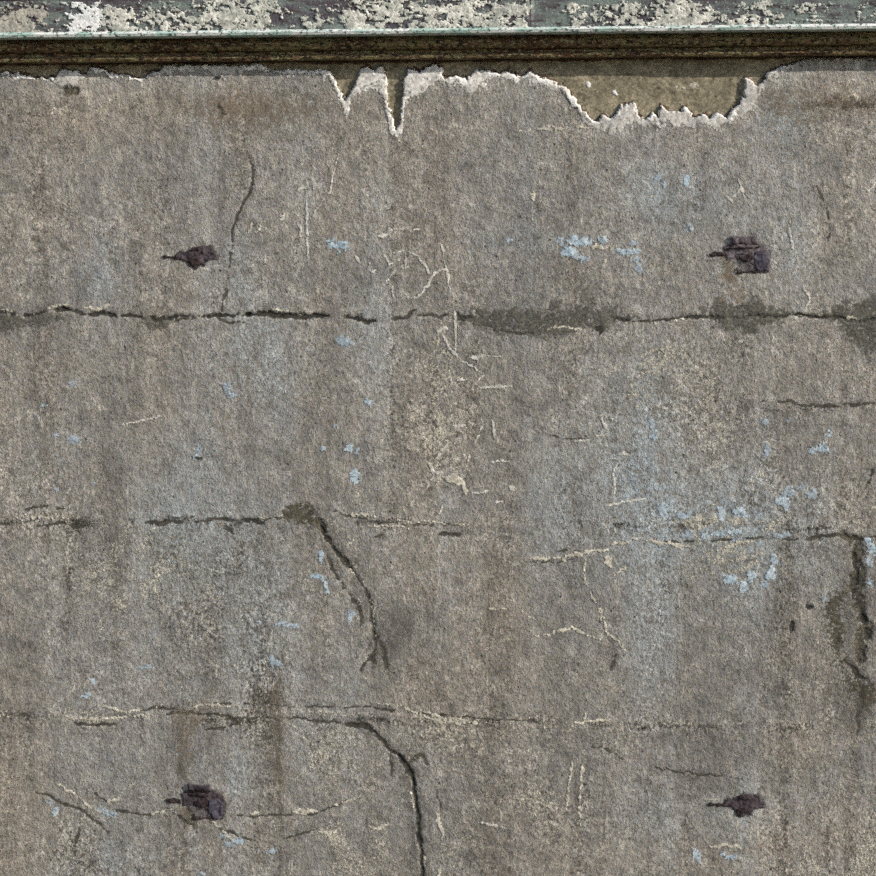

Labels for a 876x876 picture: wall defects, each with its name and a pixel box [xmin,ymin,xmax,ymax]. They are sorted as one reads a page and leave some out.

spalling [0,56,873,141]
crack [0,152,873,336]
water stain [823,295,876,361]
crack [0,505,90,530]
crack [144,503,468,673]
crack [481,530,876,736]
water stain [822,589,876,713]
crack [35,685,554,876]